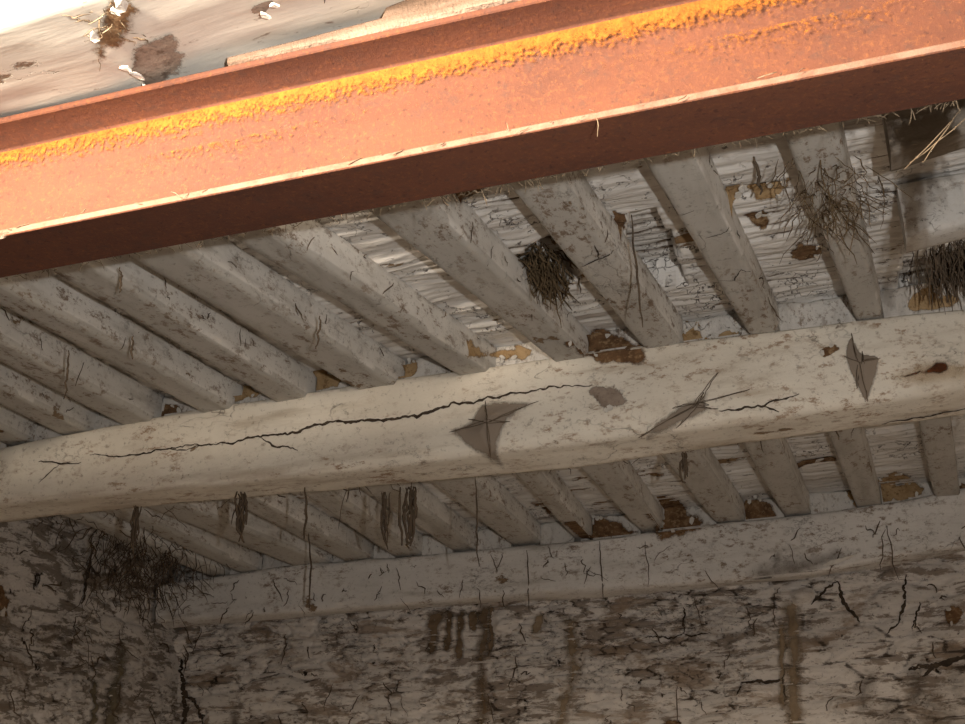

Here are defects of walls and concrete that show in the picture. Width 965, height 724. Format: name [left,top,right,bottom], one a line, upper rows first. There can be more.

spalling [90,0,138,58]
spalling [252,1,280,19]
spalling [119,34,185,86]
rust [0,0,903,177]
spalling [564,328,646,365]
crack [39,385,591,480]
crack [720,394,799,412]
crack [811,581,860,622]
crack [887,574,921,634]
crack [178,659,204,724]
leakage [427,605,495,724]
leakage [778,602,802,724]